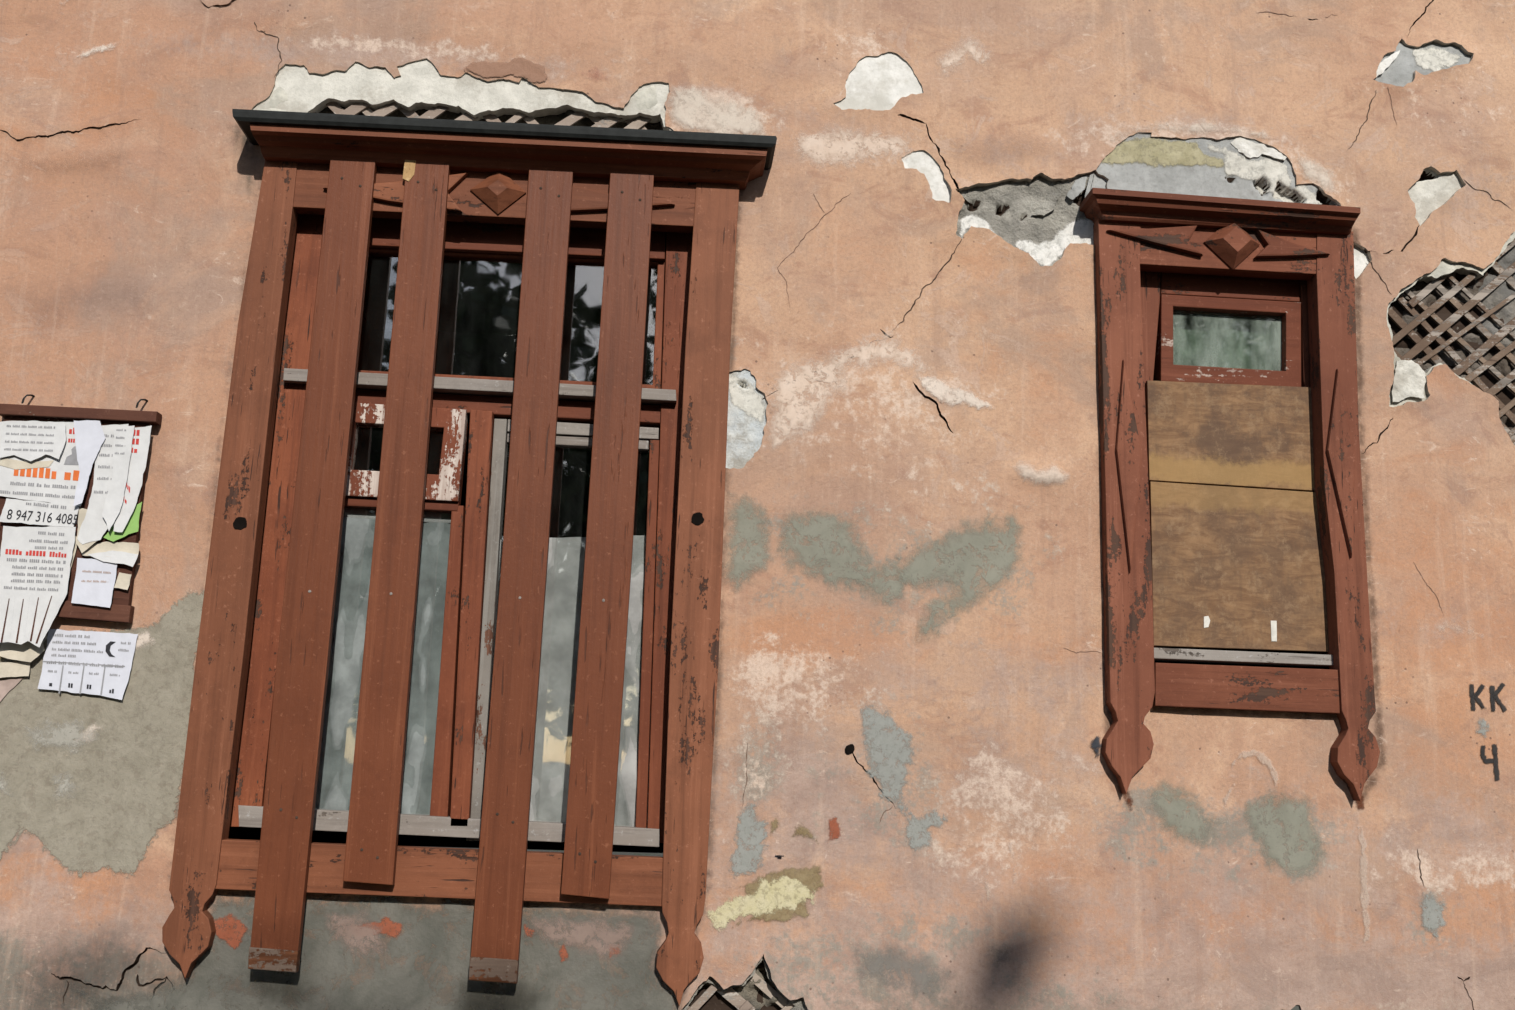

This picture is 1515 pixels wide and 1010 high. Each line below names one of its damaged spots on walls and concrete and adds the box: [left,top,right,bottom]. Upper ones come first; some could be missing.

crack [1,119,142,141]
flaking render [253,58,763,135]
spalling [834,53,923,111]
spalling [1374,42,1471,87]
flaking render [798,123,1339,266]
spalling [1408,169,1463,225]
crack [762,114,972,399]
flaking render [1386,231,1515,407]
peeling [726,336,990,469]
flaking render [682,955,808,1010]